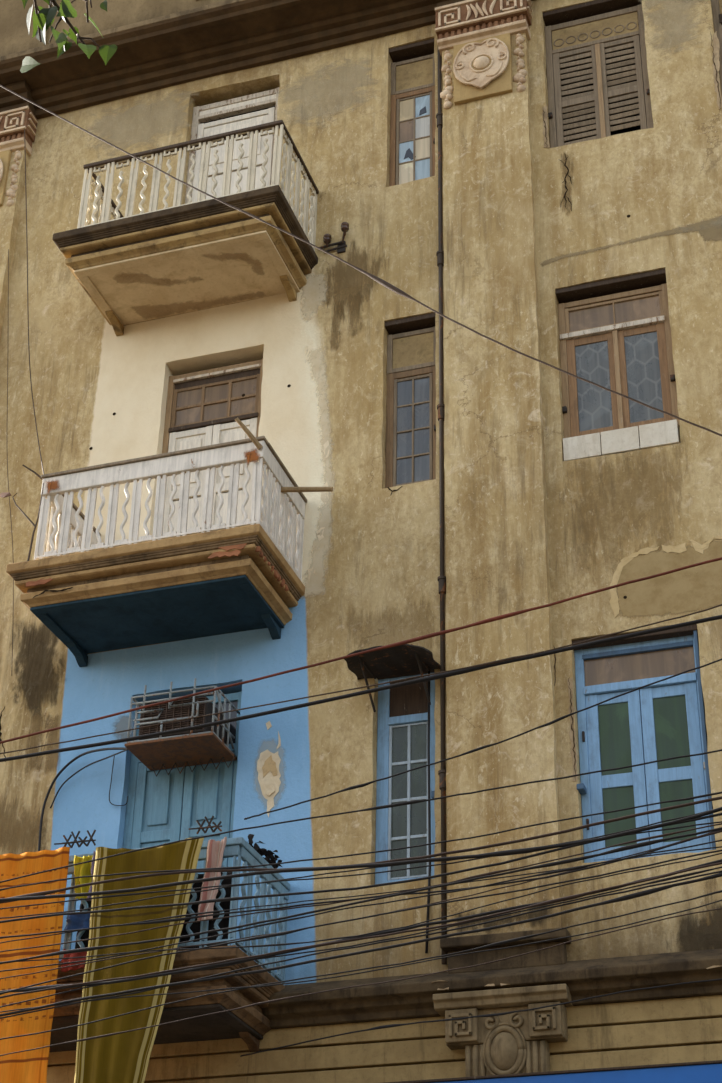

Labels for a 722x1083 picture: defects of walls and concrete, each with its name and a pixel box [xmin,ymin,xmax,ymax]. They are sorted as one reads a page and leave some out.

crack [558,153,573,212]
damp [327,242,380,348]
peeling [610,536,722,617]
peeling [257,721,281,817]